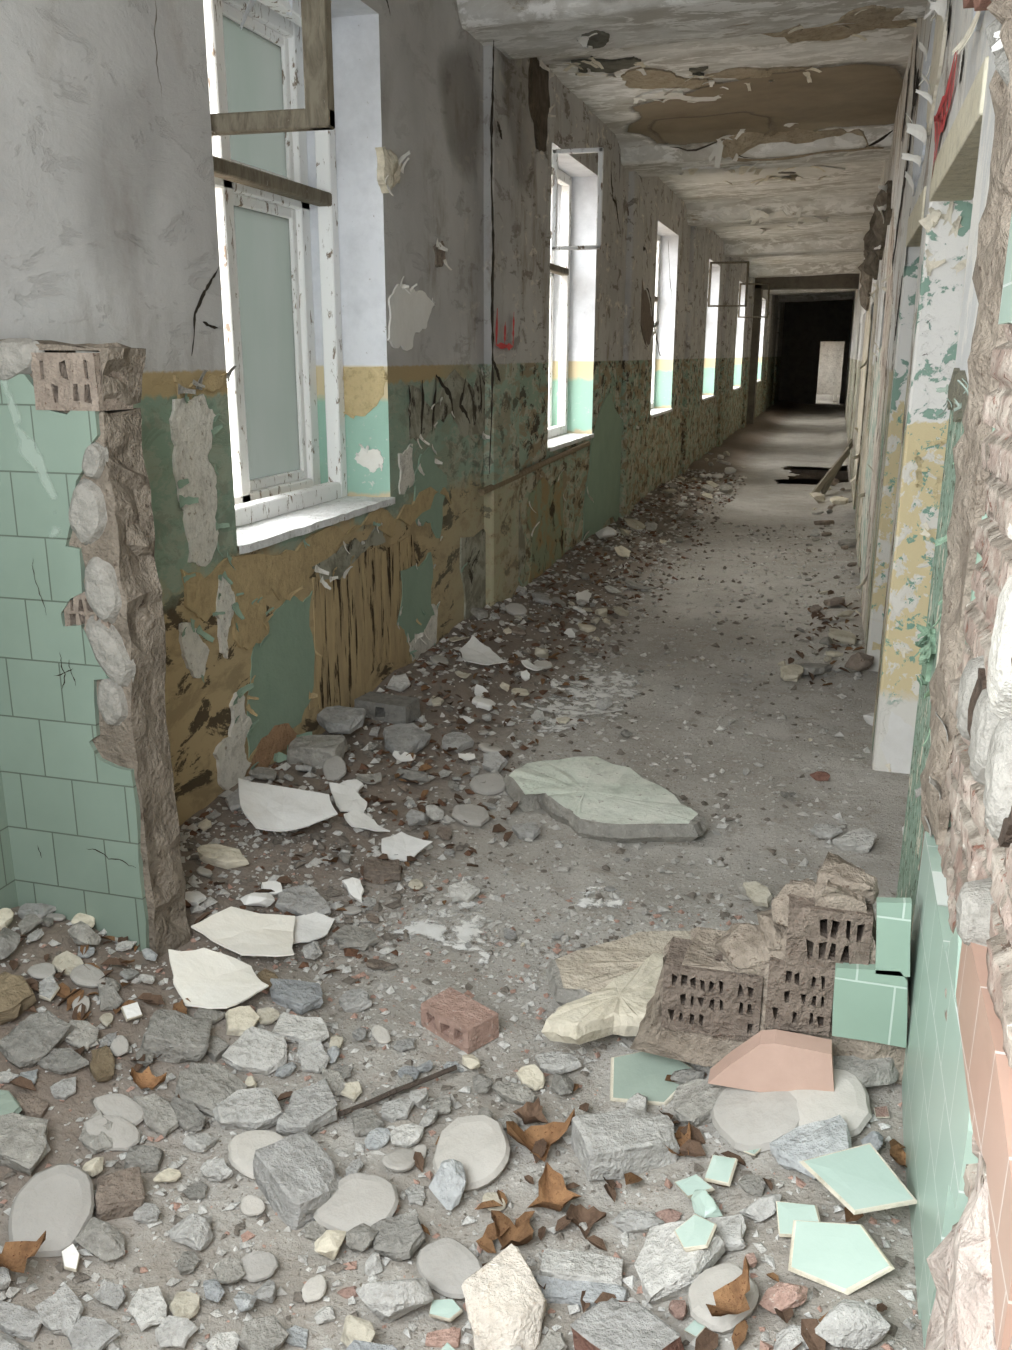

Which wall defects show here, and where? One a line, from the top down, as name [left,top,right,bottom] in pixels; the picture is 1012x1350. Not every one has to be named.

spalling [528,30,822,152]
spalling [375,147,410,196]
spalling [666,123,884,186]
spalling [707,208,829,234]
peeling [387,276,435,351]
spalling [640,279,659,347]
peeling [582,393,639,541]
spalling [763,0,1012,871]
peeling [518,469,566,585]